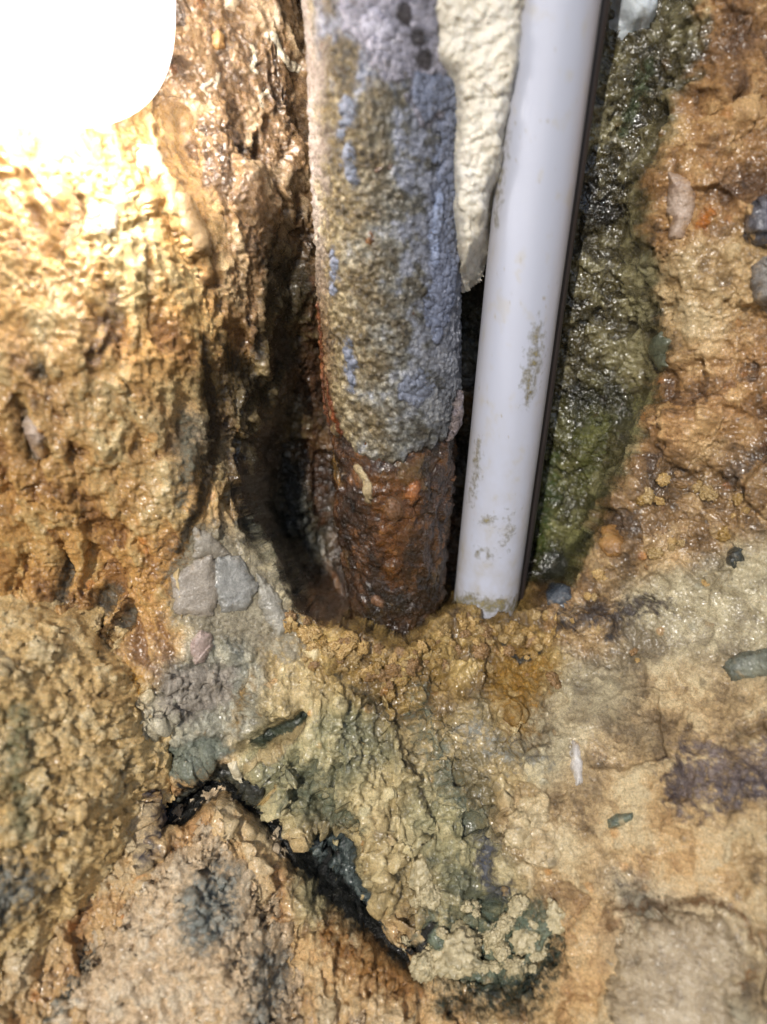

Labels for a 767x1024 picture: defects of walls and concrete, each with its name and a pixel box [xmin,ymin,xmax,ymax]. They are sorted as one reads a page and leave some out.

leakage [609,0,658,40]
rust [353,464,423,590]
rust [371,595,383,607]
crack [164,780,436,972]